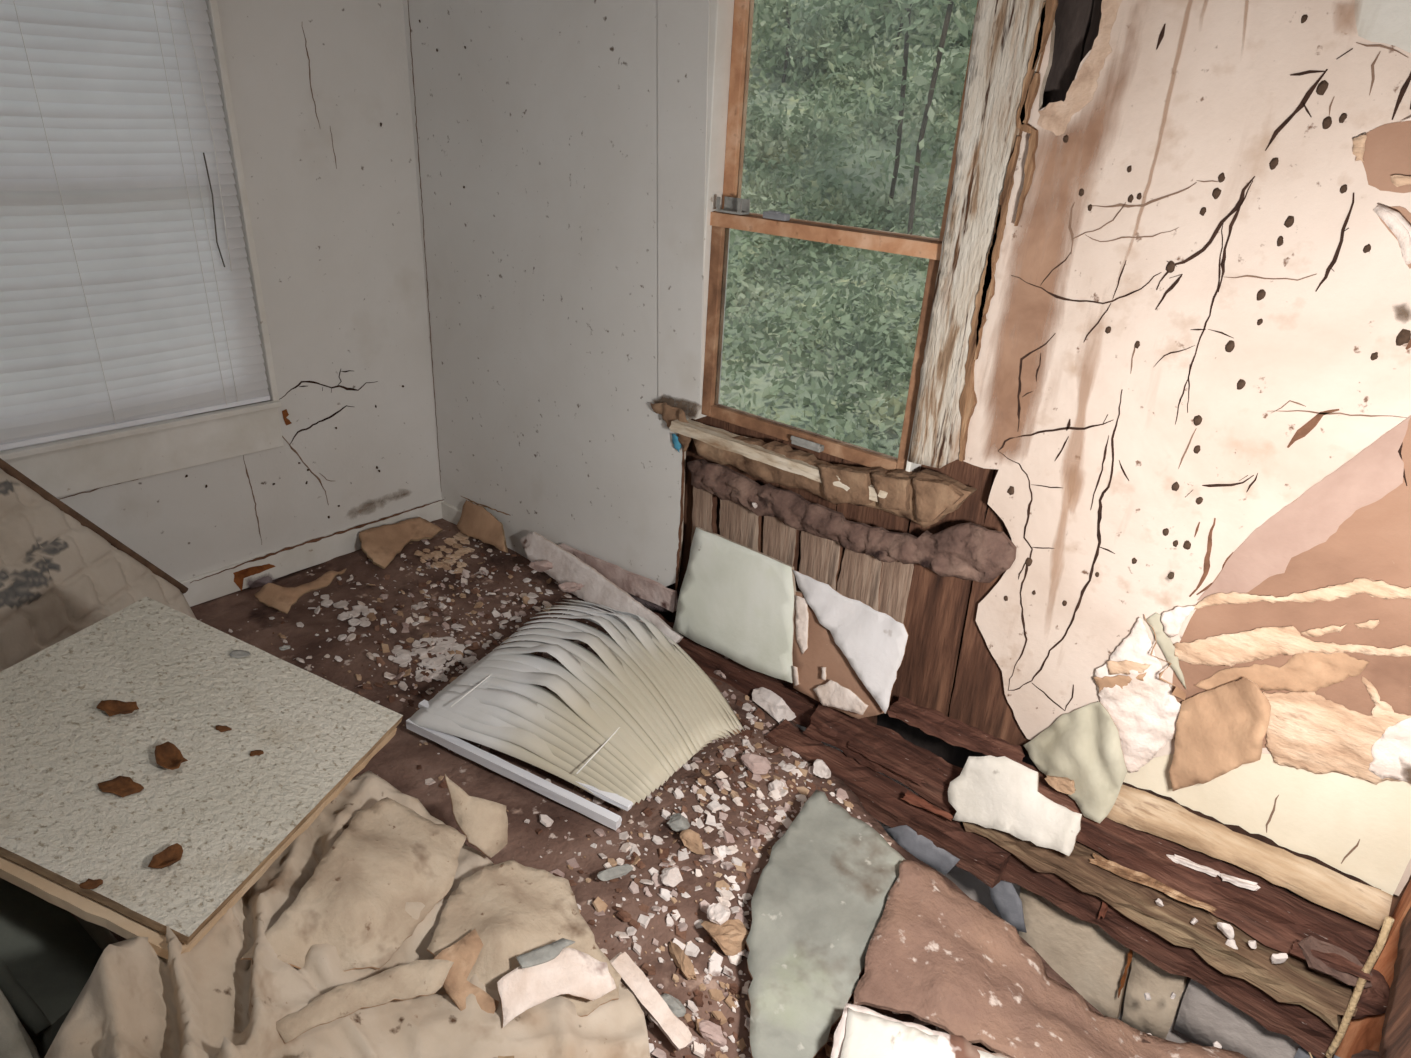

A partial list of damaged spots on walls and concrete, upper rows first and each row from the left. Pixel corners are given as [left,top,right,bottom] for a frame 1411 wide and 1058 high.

spalling [1037,0,1122,136]
peeling [1354,0,1411,53]
peeling [1352,117,1411,269]
crack [190,5,444,583]
crack [998,42,1411,711]
spalling [693,432,977,528]
peeling [1172,415,1411,716]
peeling [1024,701,1128,824]
peeling [1217,922,1288,964]